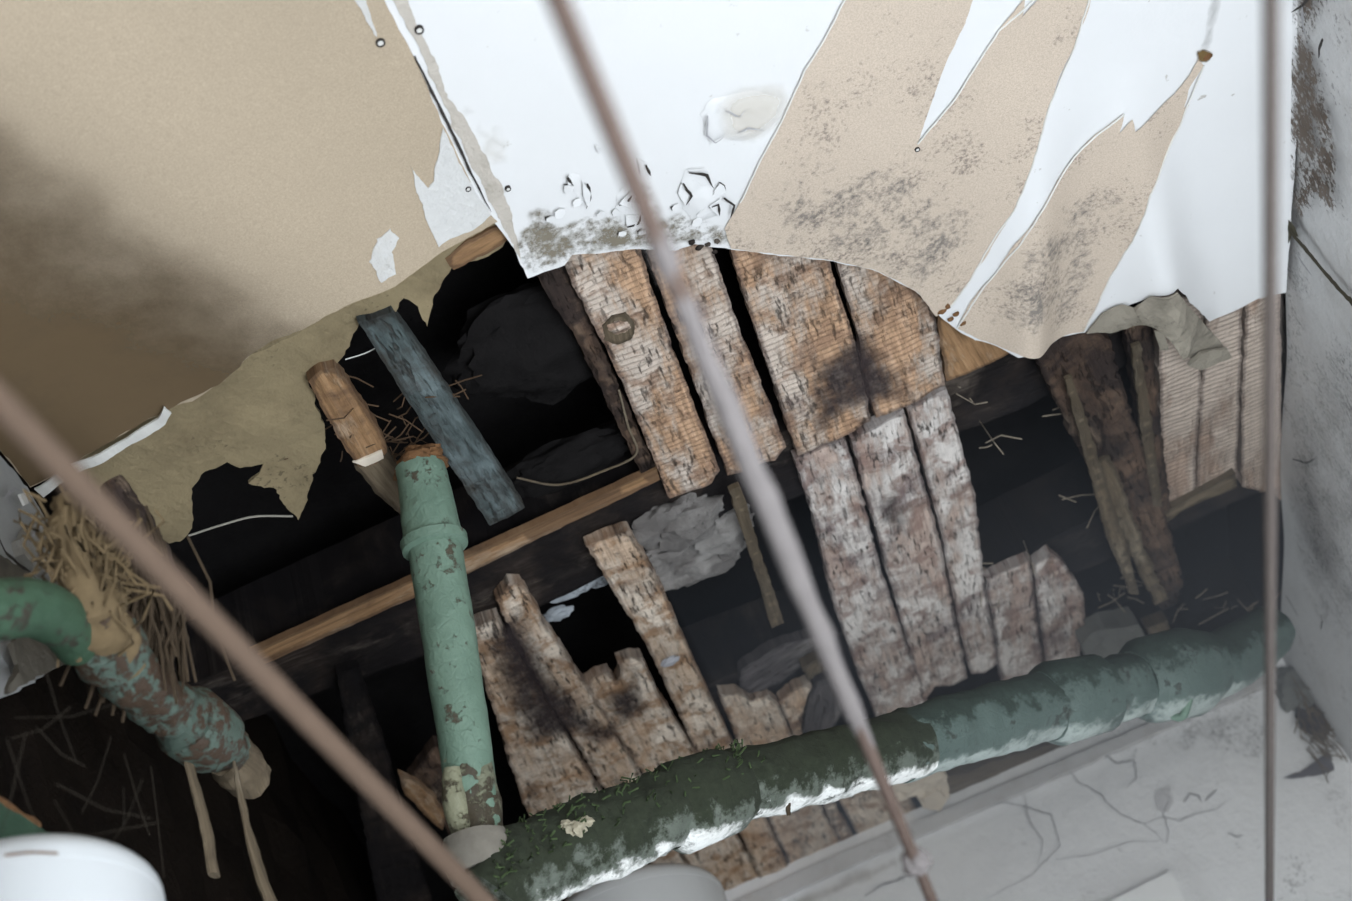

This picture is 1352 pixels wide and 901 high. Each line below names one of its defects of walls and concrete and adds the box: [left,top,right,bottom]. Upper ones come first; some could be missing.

water stain [1290,0,1336,218]
peeling [638,159,652,176]
peeling [653,0,1205,359]
peeling [369,229,399,283]
water stain [519,211,644,267]
water stain [663,218,727,243]
water stain [0,216,249,460]
water stain [0,427,49,486]